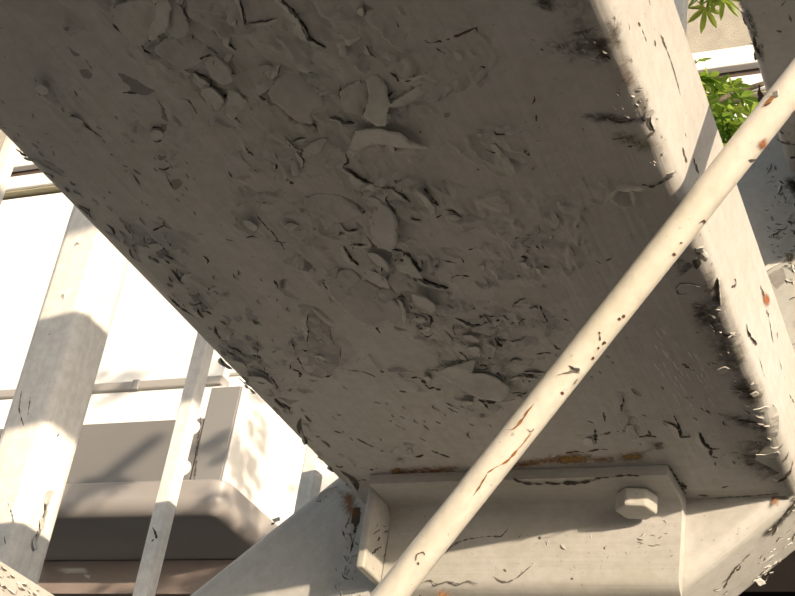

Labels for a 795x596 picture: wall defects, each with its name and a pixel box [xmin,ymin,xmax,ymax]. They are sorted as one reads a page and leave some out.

peeling [112,0,194,54]
peeling [225,0,326,49]
spalling [118,73,168,143]
mould [587,78,658,136]
peeling [310,74,554,424]
peeling [765,163,795,289]
mould [676,277,770,430]
corrosion [473,405,611,496]
mould [746,440,780,481]
spalling [0,566,41,596]
peeling [753,529,795,587]